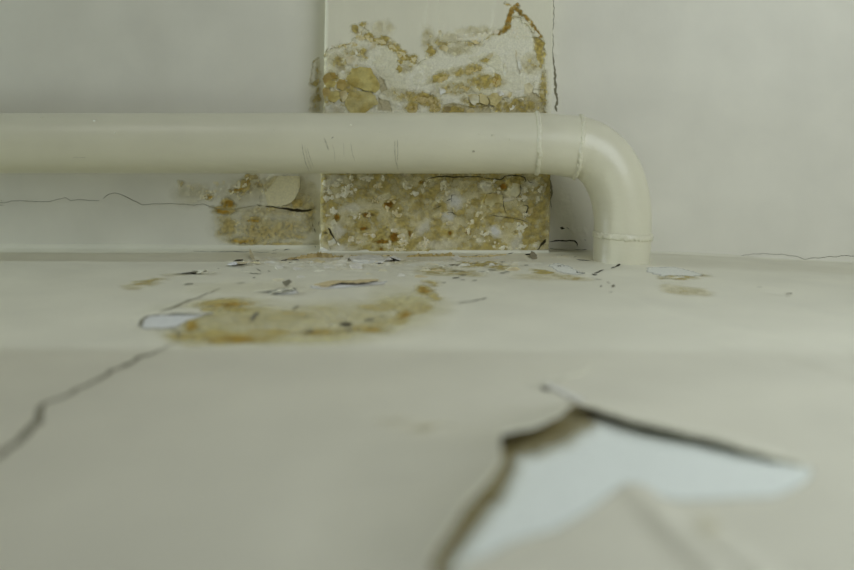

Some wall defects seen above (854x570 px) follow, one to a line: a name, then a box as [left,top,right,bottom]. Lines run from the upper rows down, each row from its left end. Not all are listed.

peeling [323,17,545,113]
crack [0,193,313,212]
crack [203,249,298,261]
damp [204,174,299,245]
spalling [227,173,583,281]
damp [286,173,551,251]
peeling [125,288,220,338]
damp [173,261,510,344]
crack [0,336,182,458]